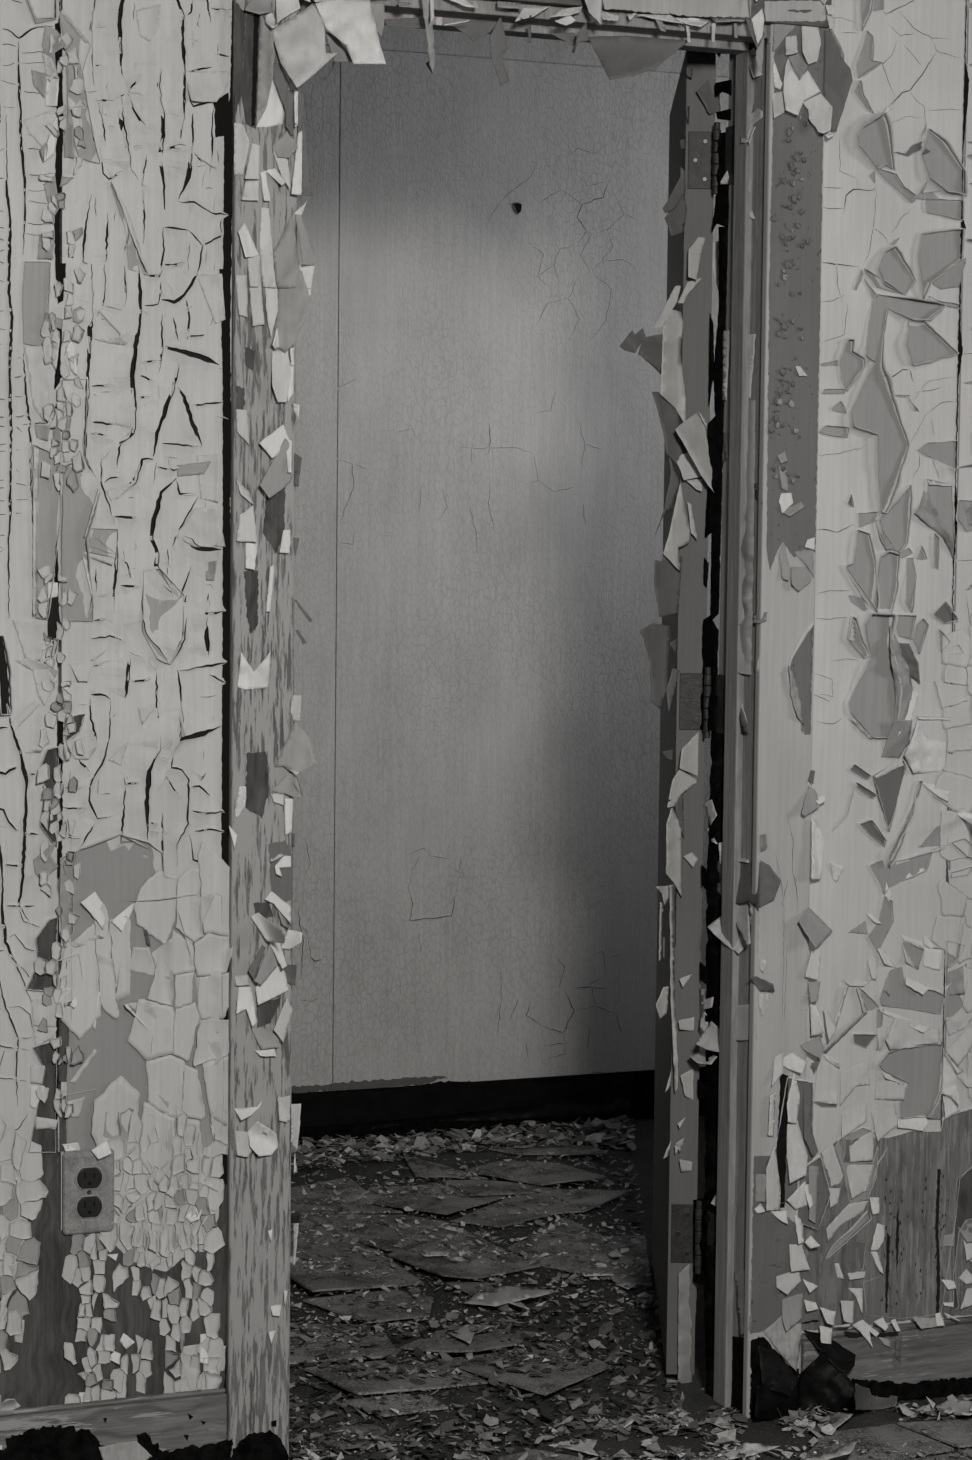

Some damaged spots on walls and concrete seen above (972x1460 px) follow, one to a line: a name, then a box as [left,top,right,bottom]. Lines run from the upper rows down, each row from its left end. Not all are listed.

crack [0,0,232,1137]
peeling [0,0,445,1411]
peeling [175,0,972,1422]
crack [834,0,972,127]
crack [882,352,972,478]
peeling [99,1441,152,1460]